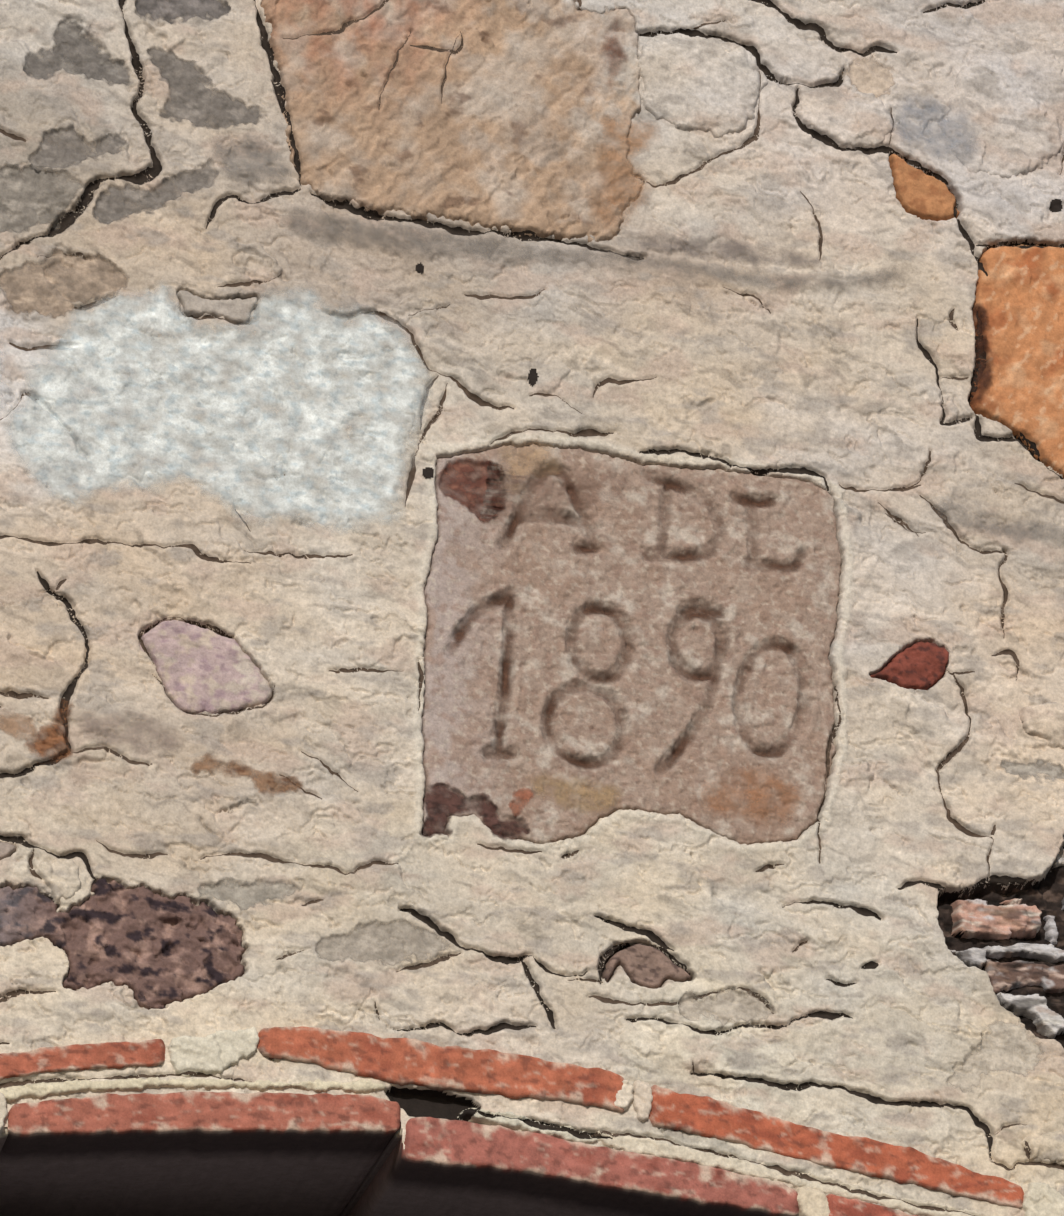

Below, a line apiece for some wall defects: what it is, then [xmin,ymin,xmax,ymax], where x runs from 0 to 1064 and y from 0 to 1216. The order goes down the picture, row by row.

crack [0,0,162,260]
crack [206,0,644,261]
crack [638,0,1064,276]
crack [324,289,657,506]
crack [0,506,353,778]
crack [329,662,424,711]
crack [639,309,1064,905]
peeling [1001,760,1064,781]
crack [374,908,879,1037]
crack [782,900,881,921]
spalling [937,835,1064,1048]
crack [691,1062,1064,1171]